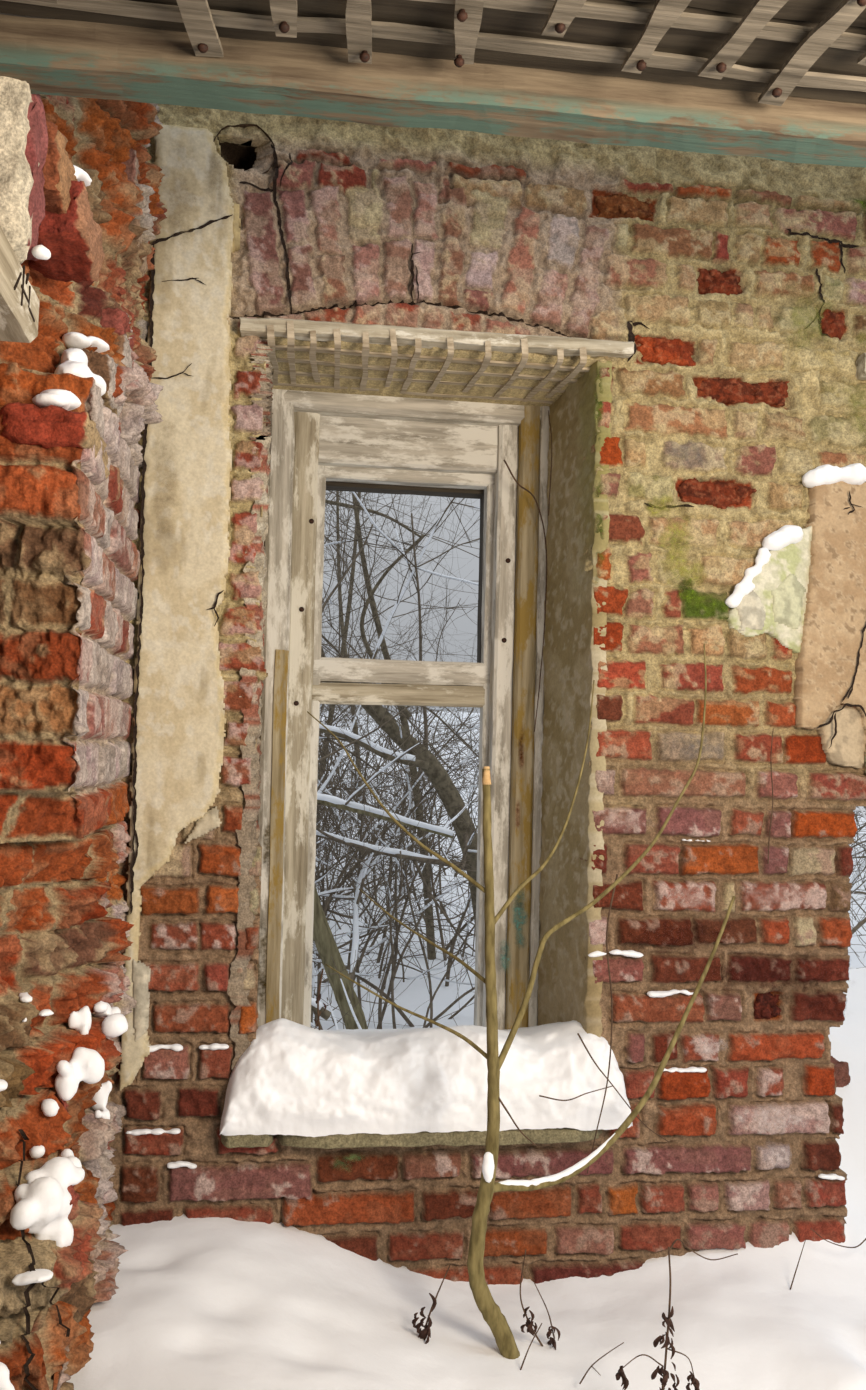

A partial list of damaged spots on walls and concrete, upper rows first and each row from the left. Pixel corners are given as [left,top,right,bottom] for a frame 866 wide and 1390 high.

crack [148,144,568,379]
crack [627,321,649,362]
crack [787,229,859,337]
crack [130,424,148,914]
peeling [81,124,275,1091]
crack [817,625,866,749]